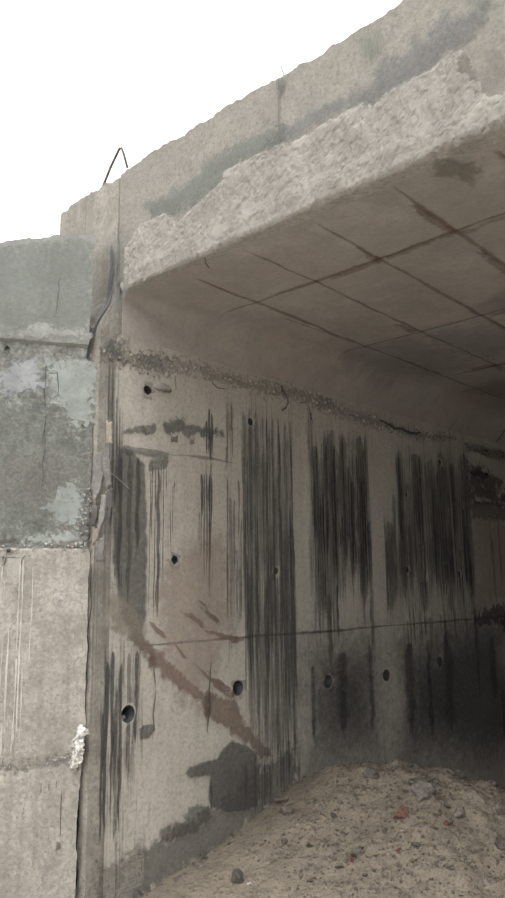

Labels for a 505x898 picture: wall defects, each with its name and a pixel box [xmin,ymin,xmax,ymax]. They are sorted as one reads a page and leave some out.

crack [92,245,113,344]
damp [309,438,372,636]
damp [386,455,505,635]
damp [99,417,299,898]